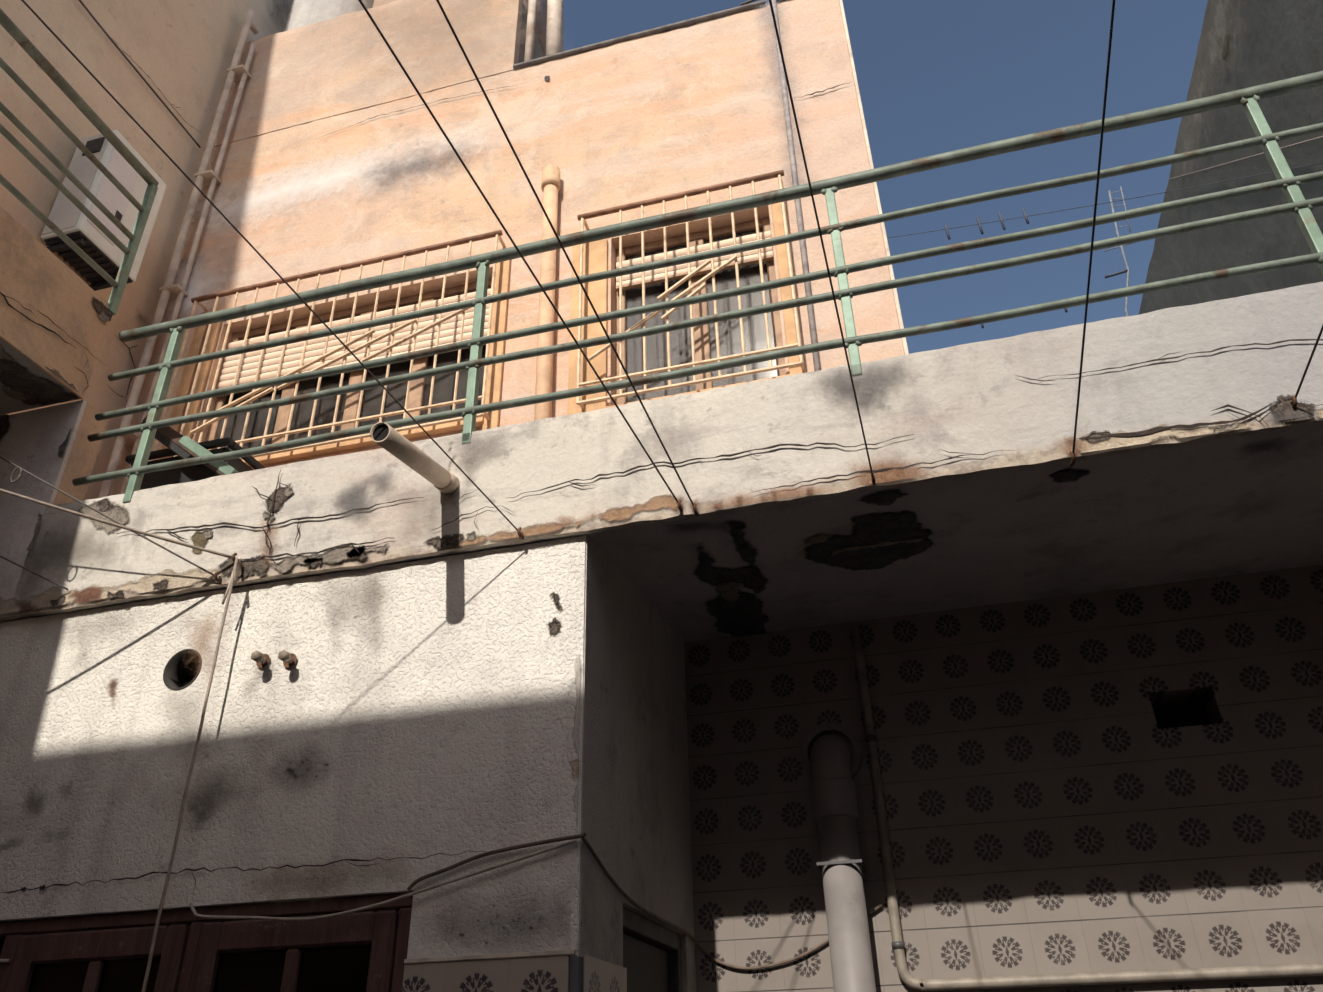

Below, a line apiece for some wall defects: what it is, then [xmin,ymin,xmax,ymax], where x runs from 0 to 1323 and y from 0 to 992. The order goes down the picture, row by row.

spalling [0,345,79,406]
crack [0,292,137,402]
crack [1016,339,1323,381]
spalling [58,429,71,456]
crack [1079,403,1273,439]
spalling [262,484,293,521]
crack [117,434,1003,565]
spalling [191,529,212,553]
spalling [218,543,388,579]
spalling [425,494,769,637]
spalling [804,489,933,571]
crack [0,851,486,898]